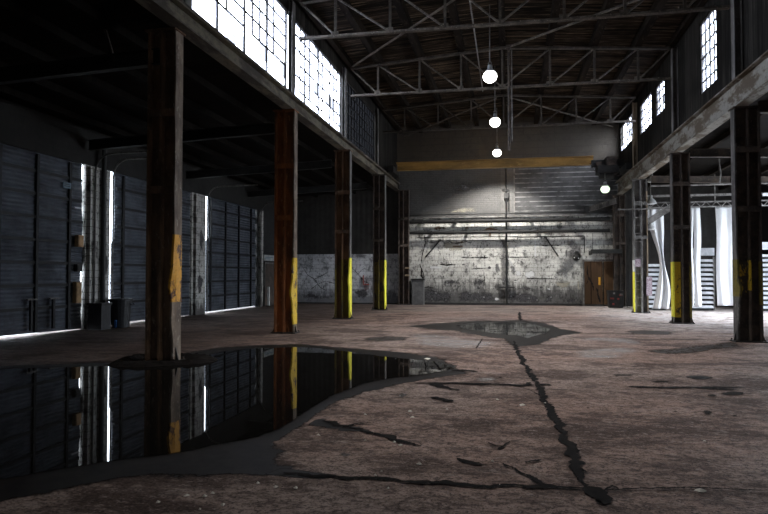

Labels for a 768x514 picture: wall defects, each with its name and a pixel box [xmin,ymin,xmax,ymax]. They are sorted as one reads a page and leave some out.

peeling [425,276,495,302]
leakage [411,320,582,346]
leakage [0,336,467,502]
crack [283,341,763,504]